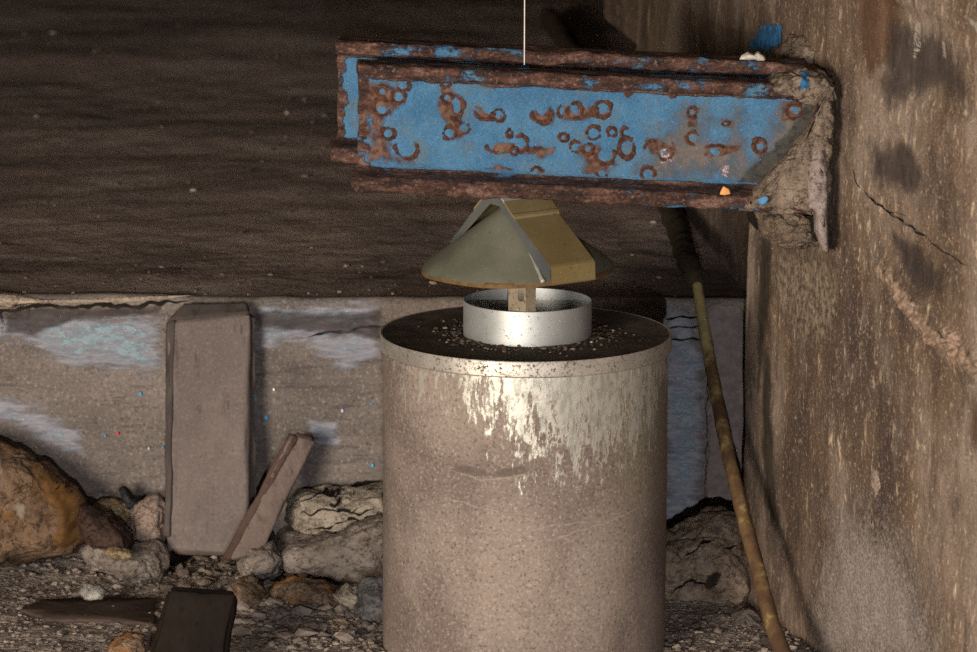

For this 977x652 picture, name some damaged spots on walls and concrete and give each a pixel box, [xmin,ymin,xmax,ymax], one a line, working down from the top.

damp [883,22,964,104]
rust [367,81,420,164]
rust [438,82,768,179]
damp [875,145,919,191]
crack [853,170,967,266]
crack [0,299,192,335]
spalling [874,269,977,374]